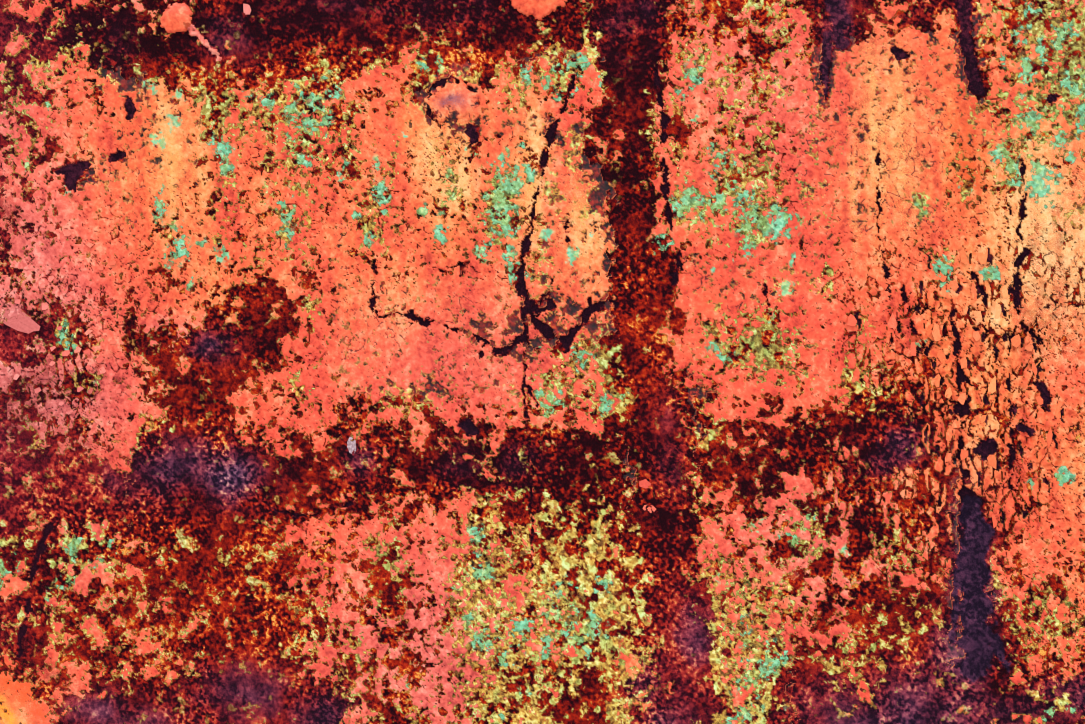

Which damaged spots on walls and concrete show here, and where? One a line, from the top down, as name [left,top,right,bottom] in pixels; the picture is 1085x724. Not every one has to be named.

peeling [2,68,138,221]
peeling [133,57,551,290]
corrosion [512,115,546,268]
peeling [471,52,604,117]
corrosion [663,92,689,176]
crack [369,73,623,569]
corrosion [492,404,517,419]
peeling [667,0,1085,658]
crack [875,151,1043,501]
peeling [0,527,167,706]
peeling [303,502,656,724]
peeling [700,516,798,724]